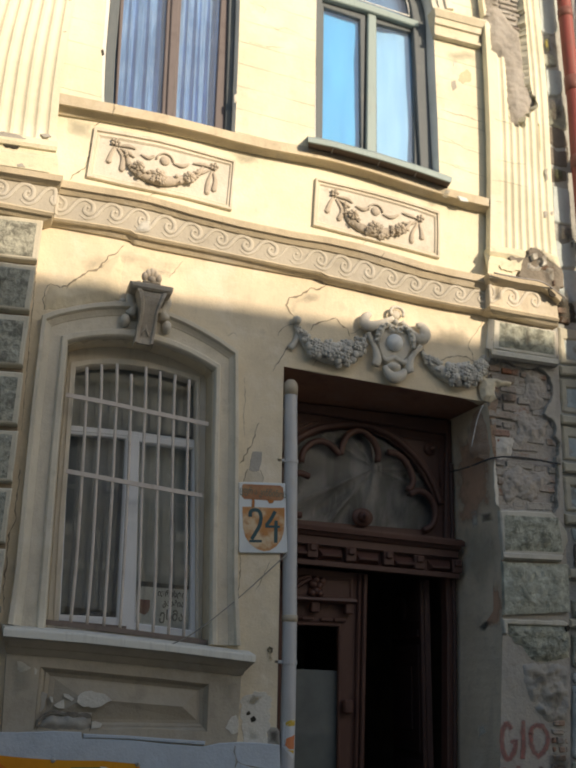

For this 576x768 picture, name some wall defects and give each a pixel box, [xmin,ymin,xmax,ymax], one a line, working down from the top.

flaking render [477,0,535,127]
crack [21,246,123,431]
crack [273,284,361,371]
flaking render [468,359,557,512]
crack [3,472,20,605]
flaking render [36,691,112,732]
peeling [225,691,280,745]